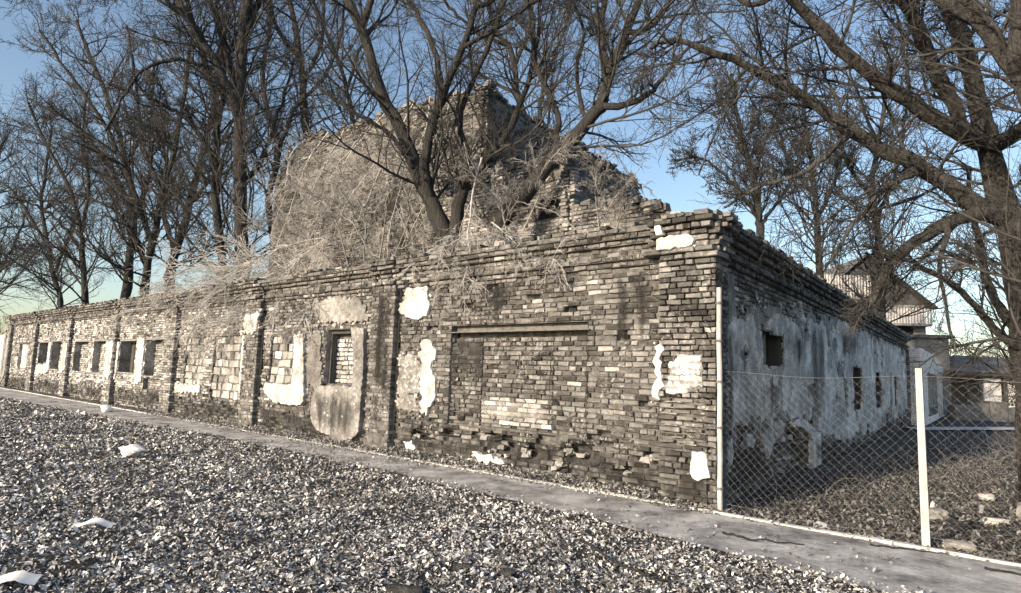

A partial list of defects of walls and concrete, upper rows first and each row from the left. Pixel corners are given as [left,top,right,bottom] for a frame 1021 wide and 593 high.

peeling [305,293,372,391]
spalling [393,339,439,417]
peeling [659,356,705,394]
peeling [726,272,908,473]
peeling [471,432,532,468]
spalling [551,448,587,471]
spalling [639,454,661,464]